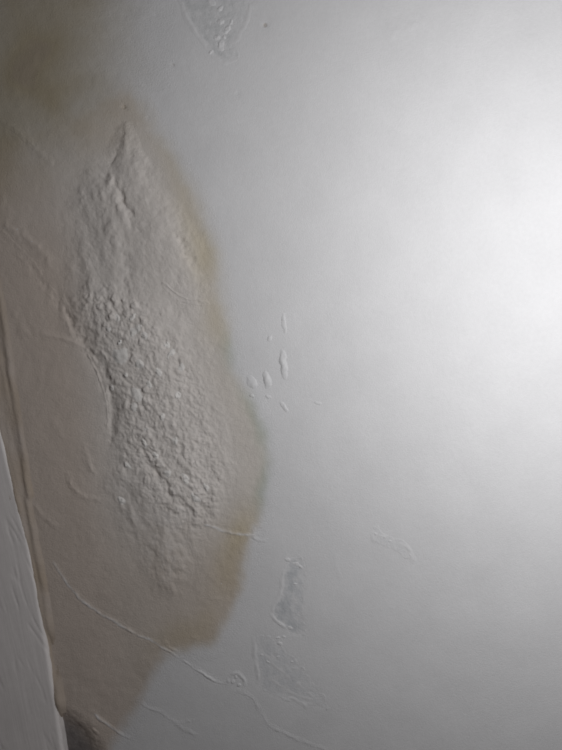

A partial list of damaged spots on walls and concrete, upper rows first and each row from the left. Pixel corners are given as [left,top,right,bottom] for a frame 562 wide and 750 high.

leakage [0,0,282,750]